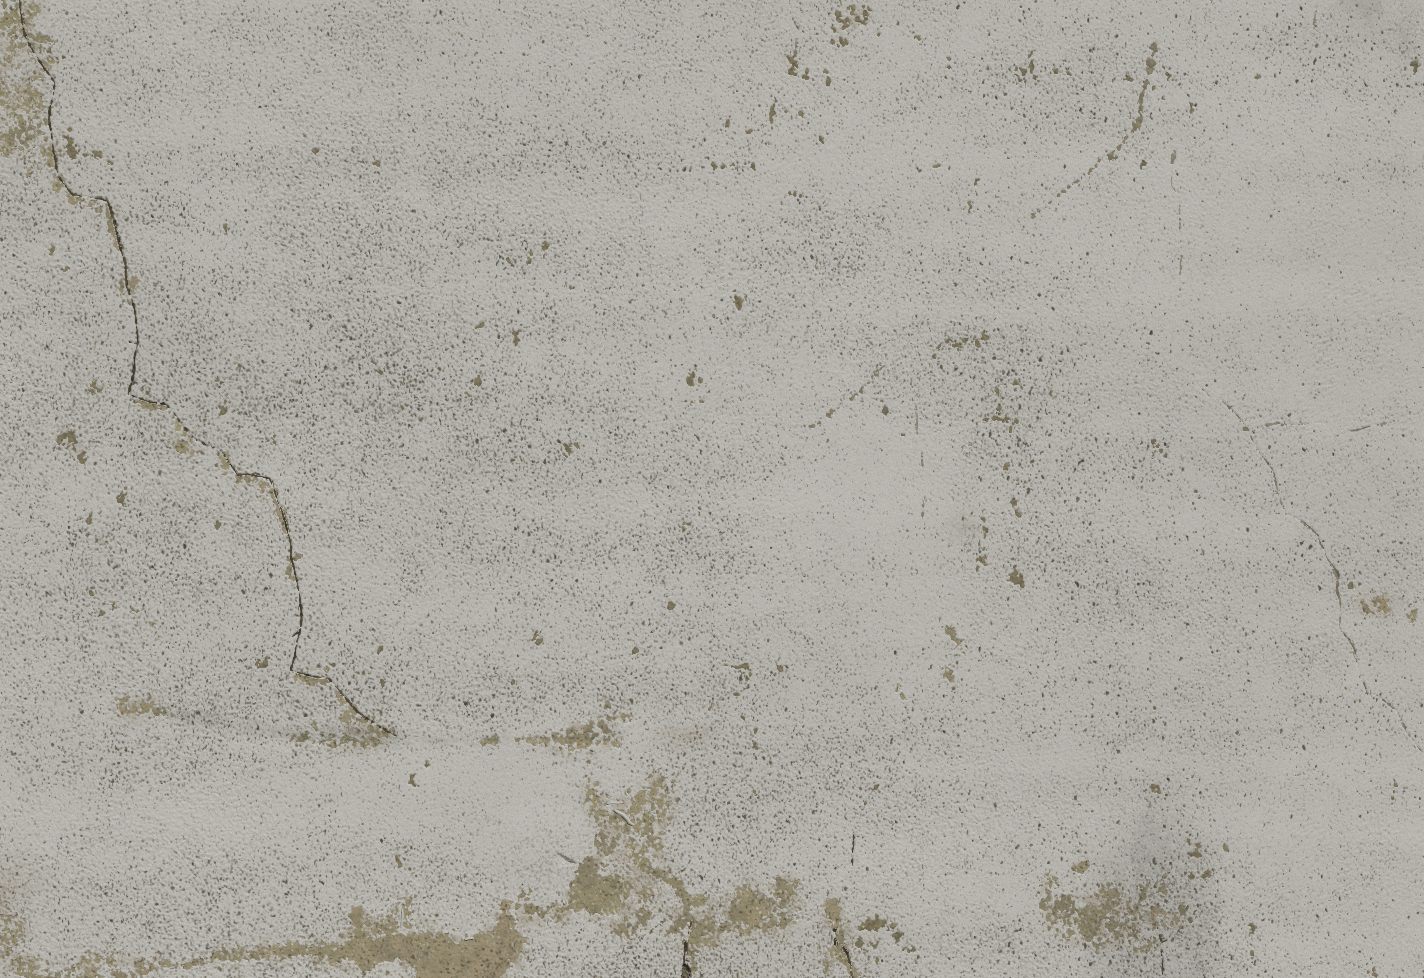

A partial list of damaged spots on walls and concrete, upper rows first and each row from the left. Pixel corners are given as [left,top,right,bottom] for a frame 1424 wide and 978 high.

peeling [0,0,114,186]
crack [19,0,396,750]
spalling [945,626,964,647]
spalling [724,663,752,696]
spalling [941,664,954,683]
spalling [115,696,174,719]
spalling [480,700,633,753]
peeling [0,768,918,978]
peeling [1036,839,1214,954]
crack [681,923,692,978]